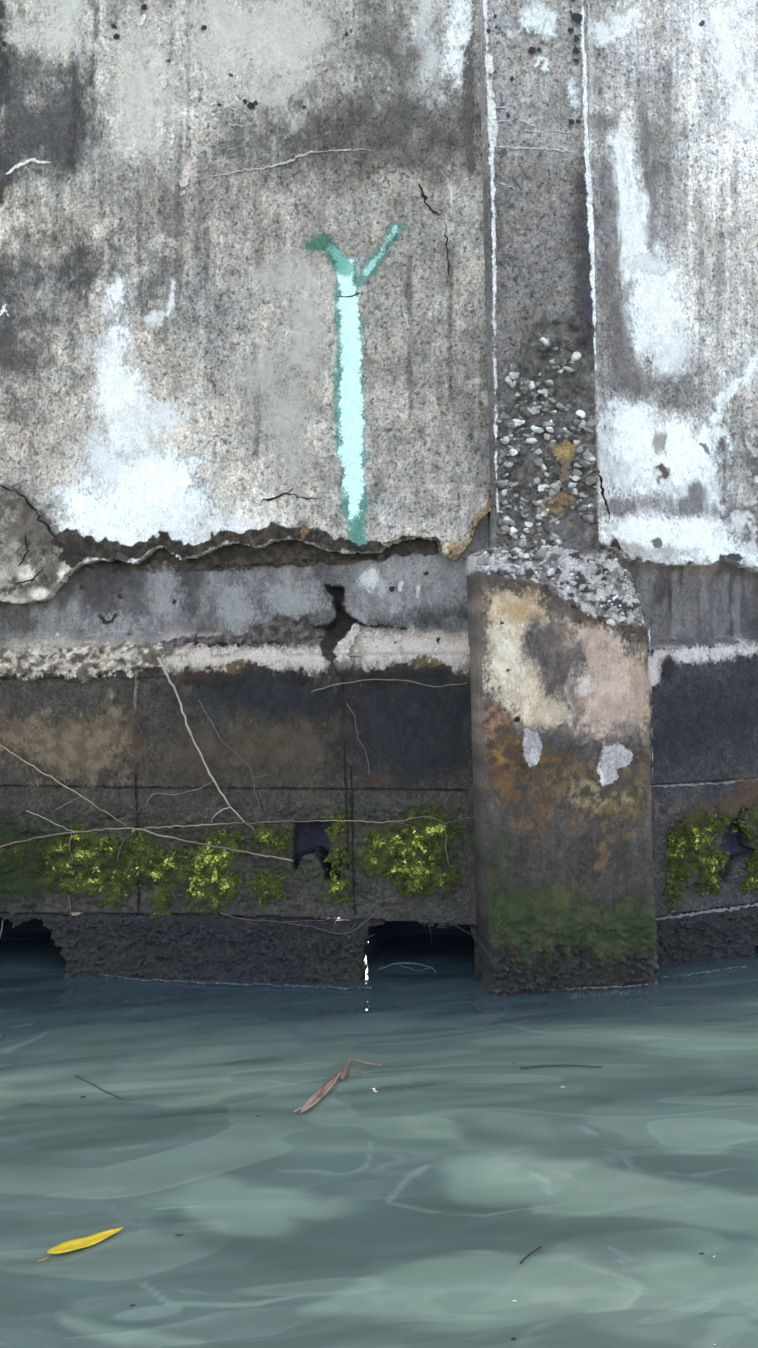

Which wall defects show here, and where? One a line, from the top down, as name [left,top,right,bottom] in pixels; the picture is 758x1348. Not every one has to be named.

leakage [0,231,274,640]
spalling [0,613,328,683]
crack [179,584,406,695]
leakage [0,0,758,567]
spalling [50,330,758,786]
corrosion [483,685,758,836]